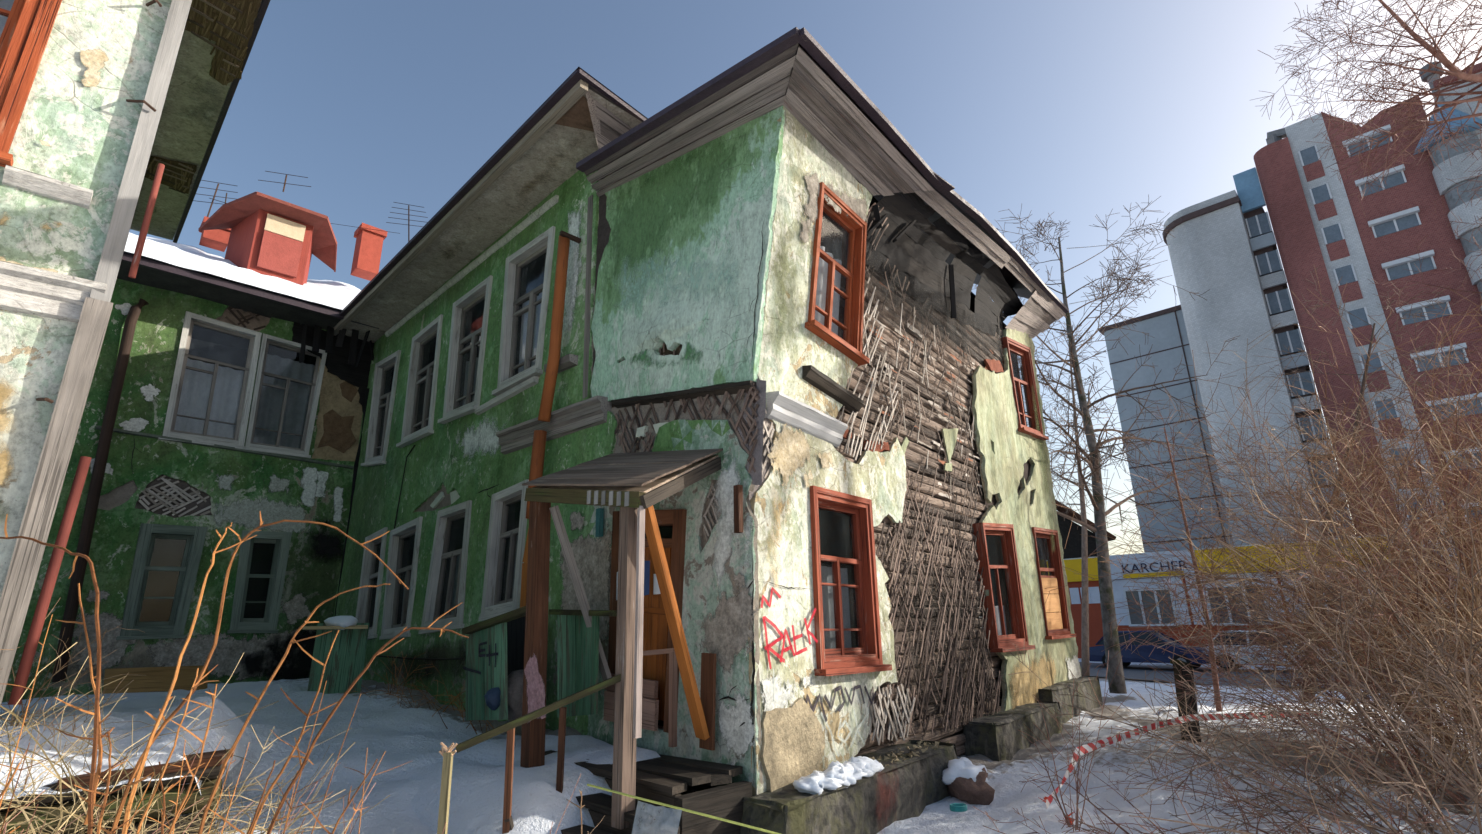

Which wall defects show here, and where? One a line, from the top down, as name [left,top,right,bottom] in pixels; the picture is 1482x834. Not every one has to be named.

flaking render [184,0,261,86]
flaking render [312,358,363,461]
peeling [84,458,311,533]
flaking render [611,244,1004,757]
flaking render [1017,460,1030,493]
flaking render [715,674,825,792]